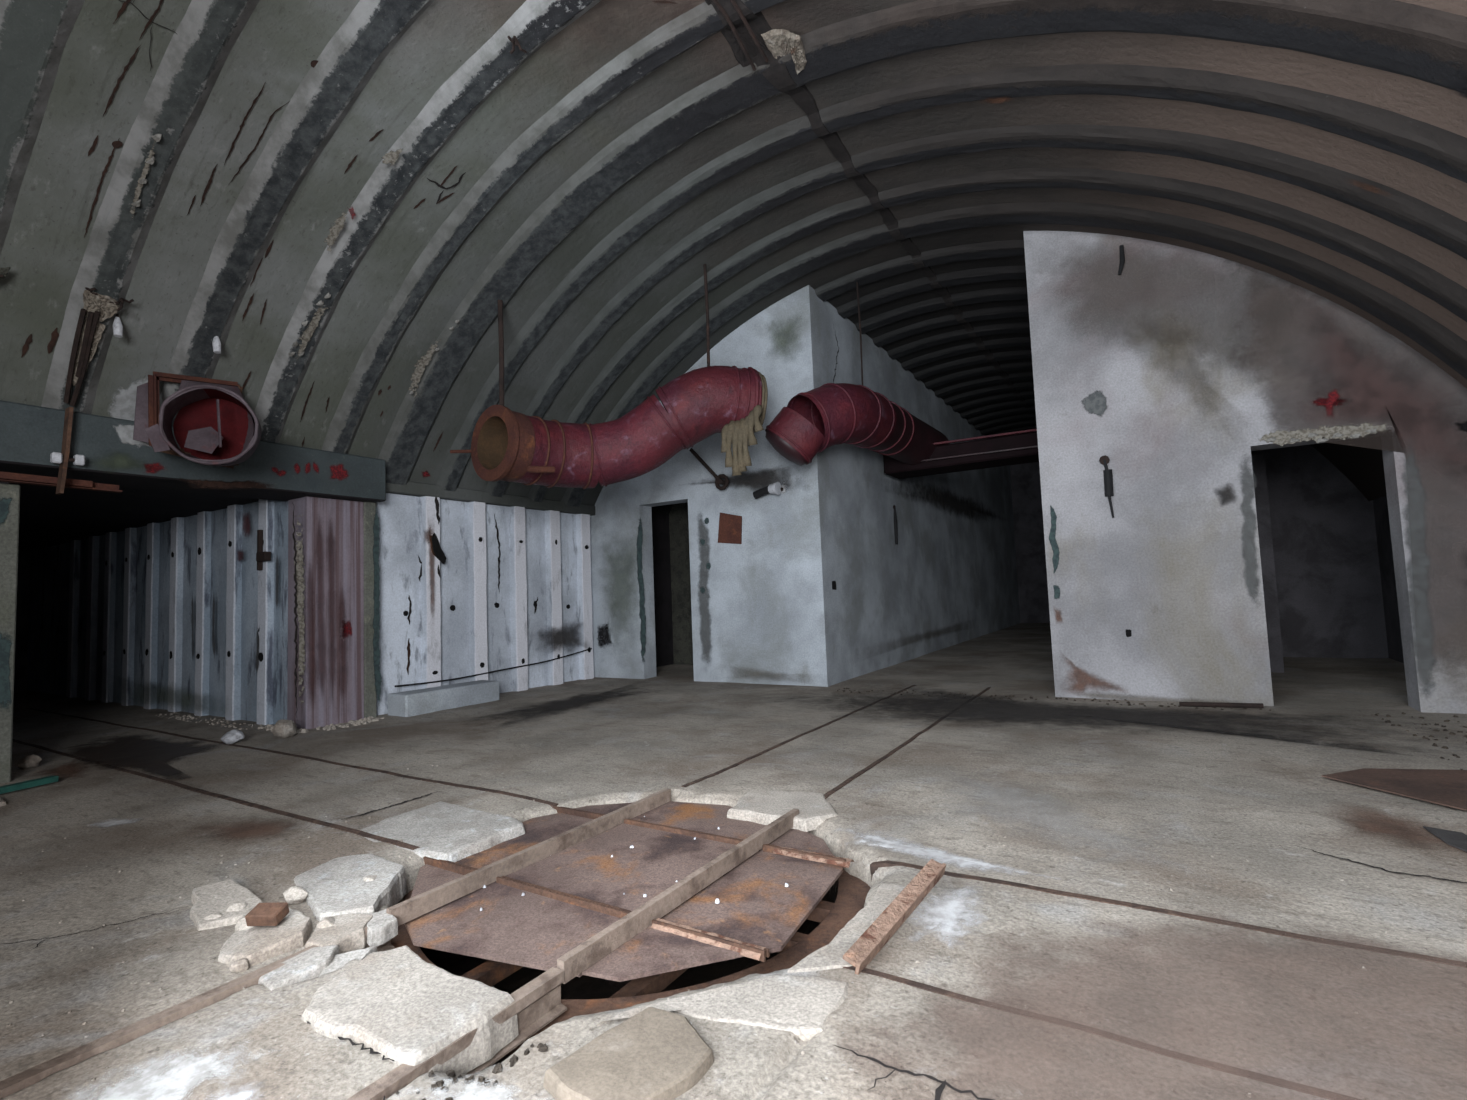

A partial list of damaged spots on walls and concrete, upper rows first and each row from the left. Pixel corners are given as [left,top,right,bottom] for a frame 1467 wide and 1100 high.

crack [119,0,177,71]
spalling [63,290,120,406]
leakage [67,735,215,779]
rust [773,846,854,868]
rust [651,918,766,960]
crack [832,1044,994,1100]